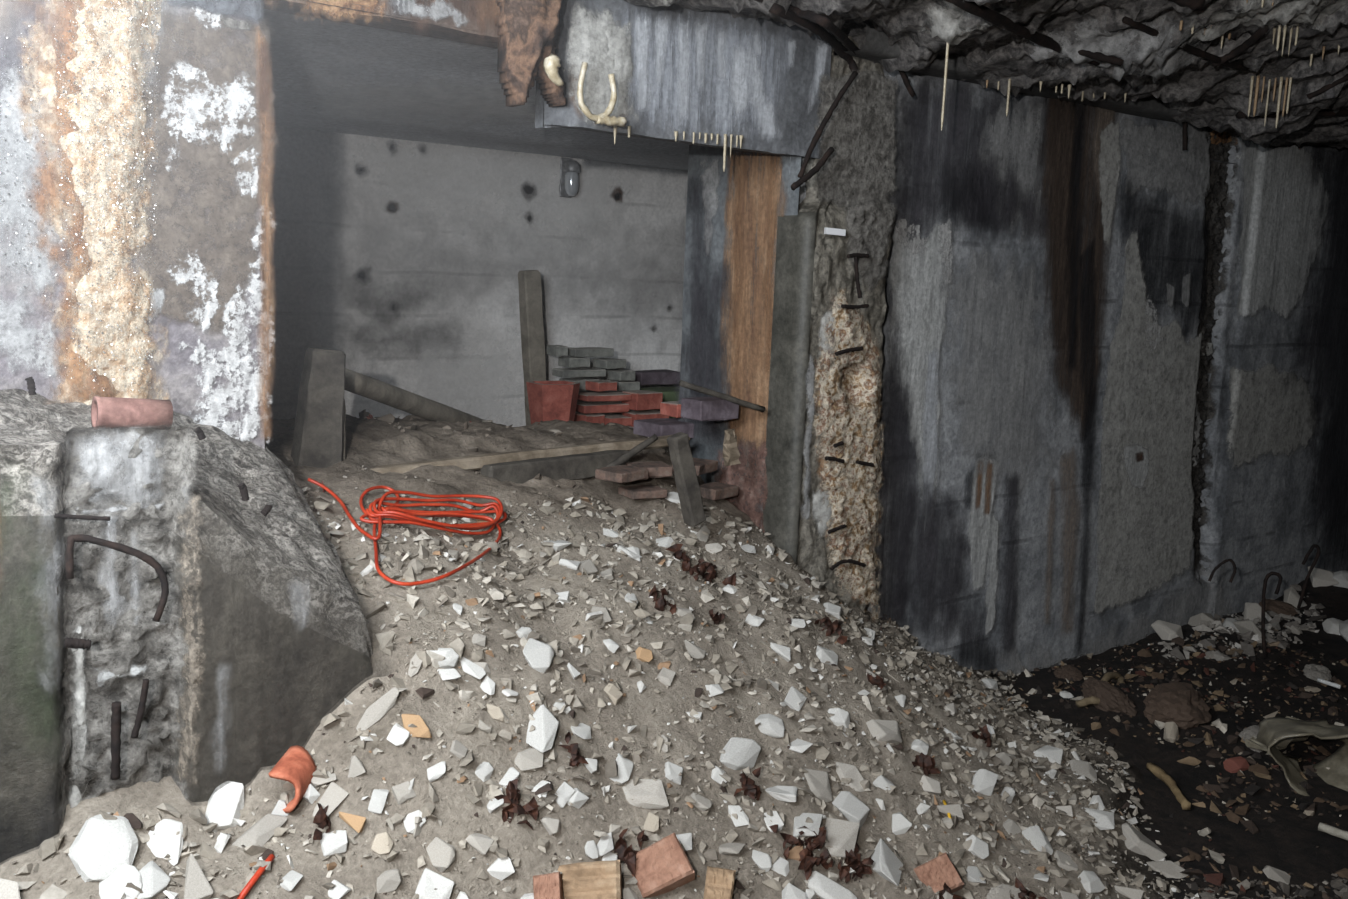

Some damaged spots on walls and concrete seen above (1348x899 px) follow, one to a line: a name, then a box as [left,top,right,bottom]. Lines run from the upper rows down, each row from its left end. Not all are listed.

rust [414,0,632,123]
spalling [944,0,1124,66]
spalling [1122,16,1159,37]
spalling [1178,25,1269,72]
spalling [1235,111,1280,119]
spalling [1306,74,1348,117]
damp [138,0,274,332]
spalling [755,0,915,620]
spalling [25,377,37,395]
damp [876,80,1230,676]
damp [1297,146,1348,569]